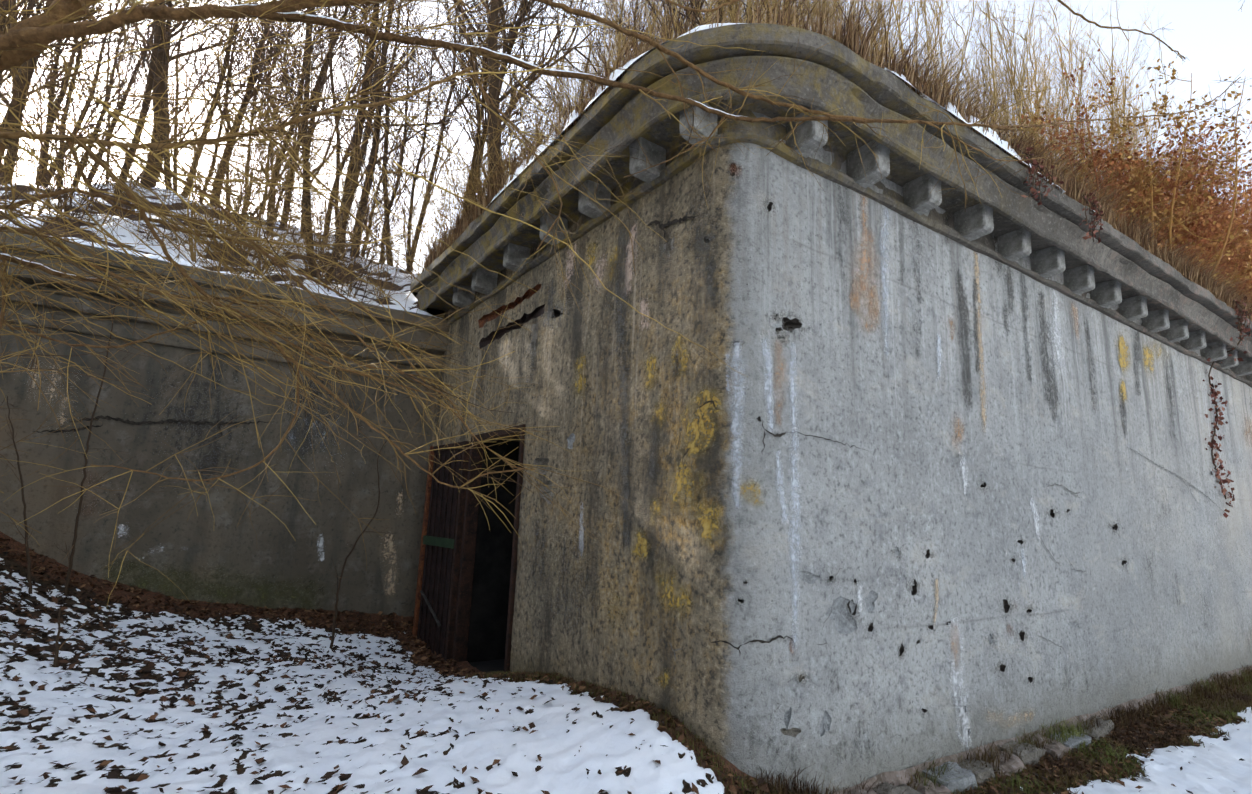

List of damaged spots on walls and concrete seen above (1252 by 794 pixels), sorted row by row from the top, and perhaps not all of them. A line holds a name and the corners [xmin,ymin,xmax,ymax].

hole [772,313,805,343]
leakage [956,272,979,405]
leakage [995,246,1062,420]
crack [33,415,269,435]
efflorescence [727,343,742,507]
efflorescence [763,341,773,428]
crack [761,420,868,455]
efflorescence [777,361,800,619]
crack [669,567,844,659]
spalling [910,578,920,595]
spalling [898,621,951,659]
spalling [1003,599,1032,615]